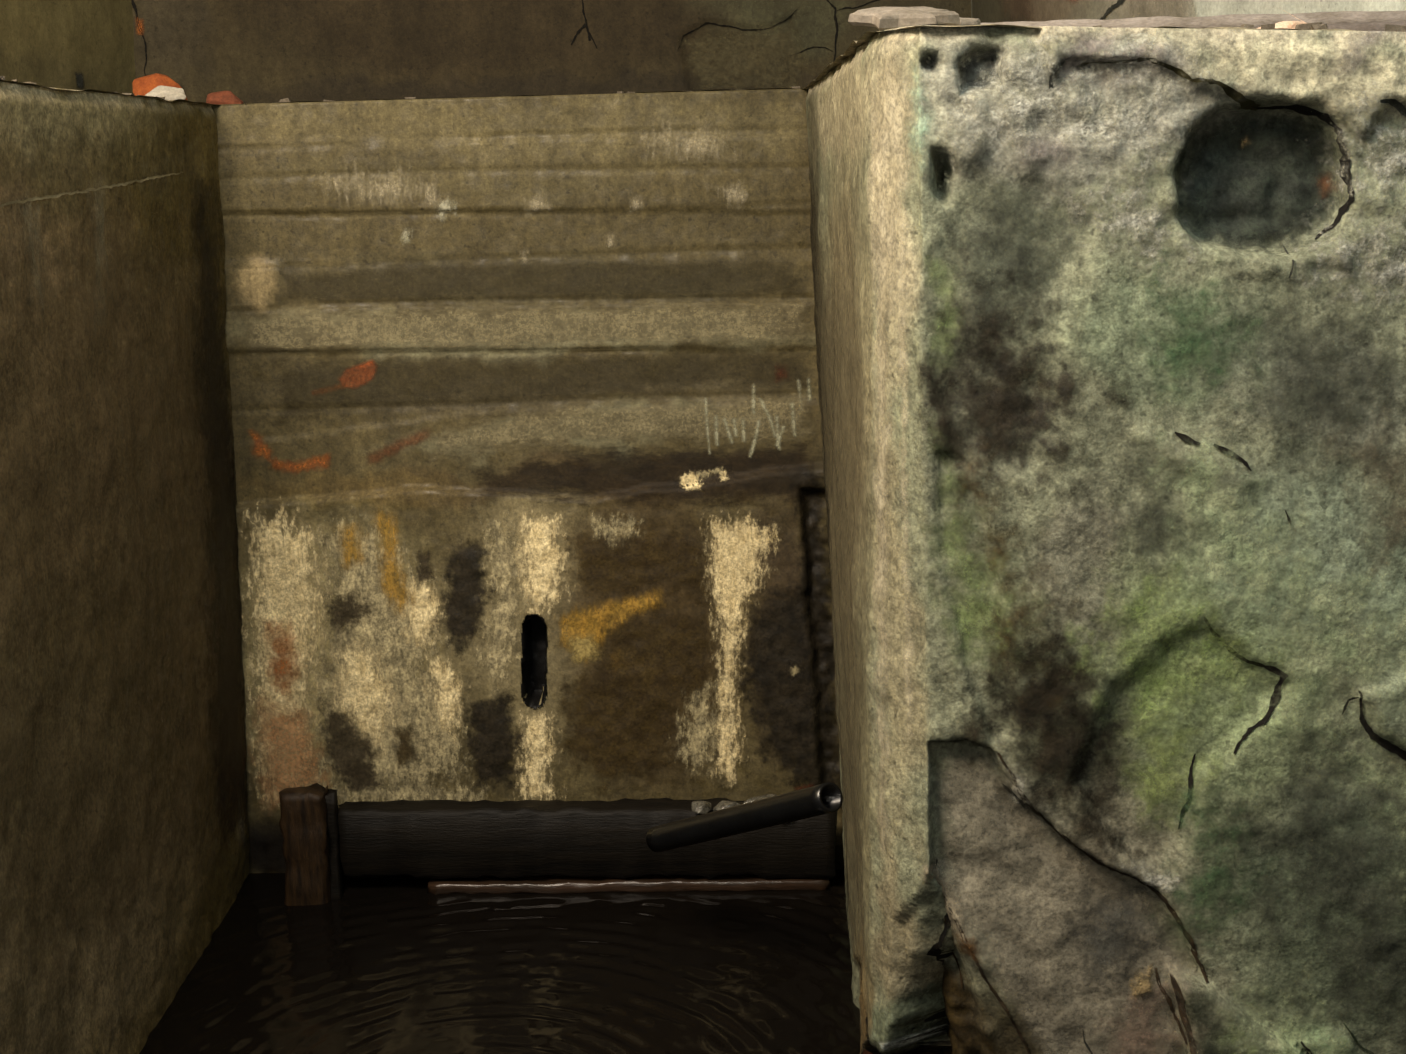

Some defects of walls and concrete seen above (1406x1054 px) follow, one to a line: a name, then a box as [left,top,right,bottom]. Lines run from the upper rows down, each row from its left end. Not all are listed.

crack [827,0,877,61]
damp [872,57,926,595]
damp [919,33,1203,506]
spalling [1099,0,1124,20]
damp [1338,89,1406,193]
spalling [0,82,831,1054]
damp [192,185,841,842]
damp [961,574,1145,855]
spalling [806,6,1406,1054]
crack [1178,754,1196,829]
crack [1203,617,1288,754]
crack [1342,691,1406,761]